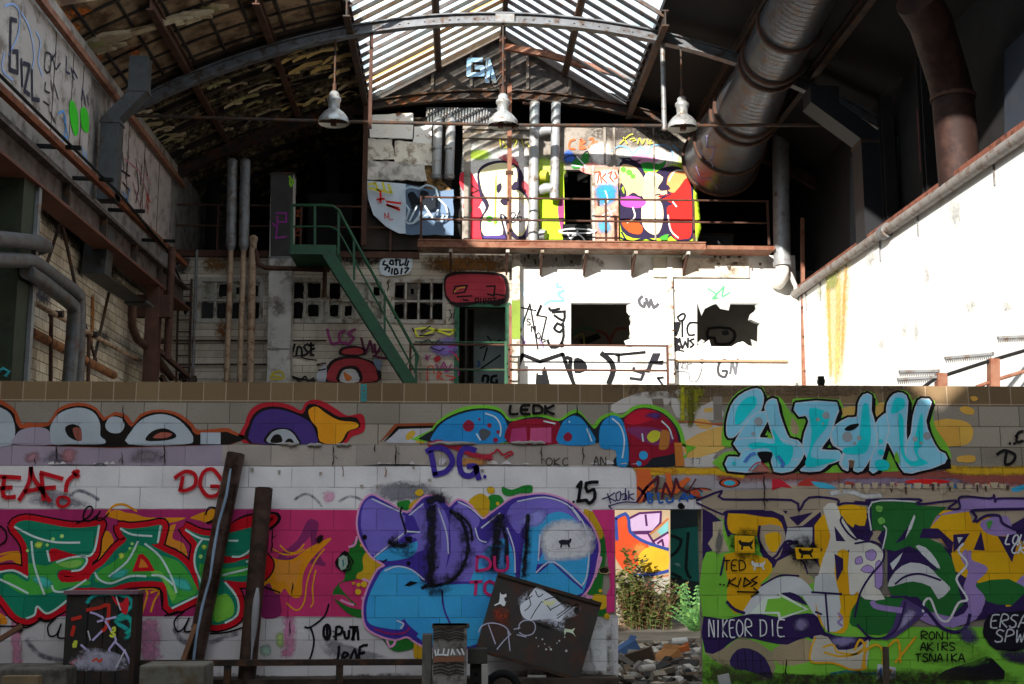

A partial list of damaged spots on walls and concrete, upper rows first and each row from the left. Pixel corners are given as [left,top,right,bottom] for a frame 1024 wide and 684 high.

peeling [624,303,634,345]
peeling [697,303,730,316]
peeling [751,303,761,324]
corrosion [823,268,850,383]